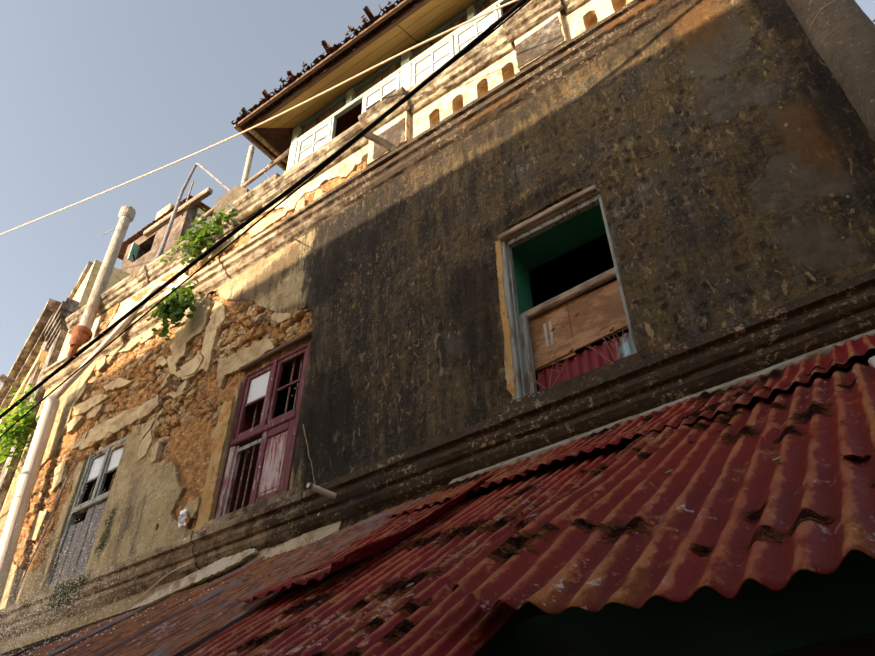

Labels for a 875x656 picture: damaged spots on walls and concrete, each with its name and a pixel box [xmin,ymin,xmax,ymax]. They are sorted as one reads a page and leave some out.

spalling [13,292,312,572]
rust [626,441,660,460]
rust [676,368,787,444]
rust [768,400,833,443]
rust [437,471,490,493]
rust [498,482,542,502]
rust [406,501,654,563]
rust [688,543,714,556]
rust [741,501,836,549]
rust [223,589,345,653]
rust [334,566,444,645]
rust [281,647,366,656]